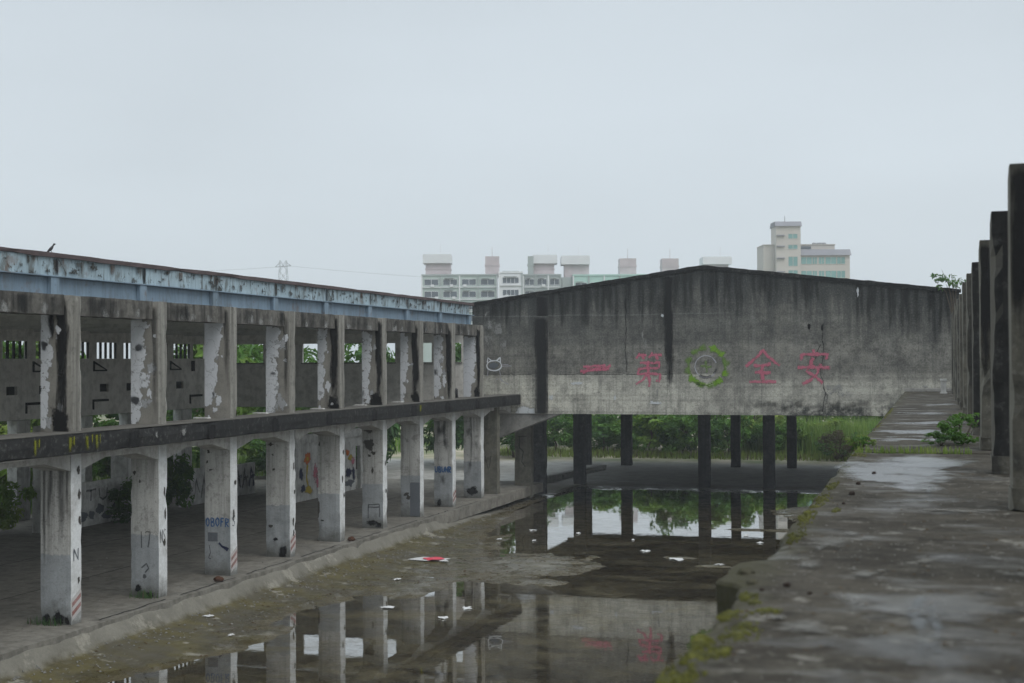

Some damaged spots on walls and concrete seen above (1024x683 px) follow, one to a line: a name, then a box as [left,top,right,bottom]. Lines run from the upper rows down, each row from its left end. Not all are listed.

peeling [41,315,63,429]
peeling [131,320,157,424]
peeling [204,323,223,417]
peeling [266,326,288,413]
peeling [317,329,334,408]
peeling [362,331,376,404]
leakage [664,277,674,382]
crack [815,324,828,412]